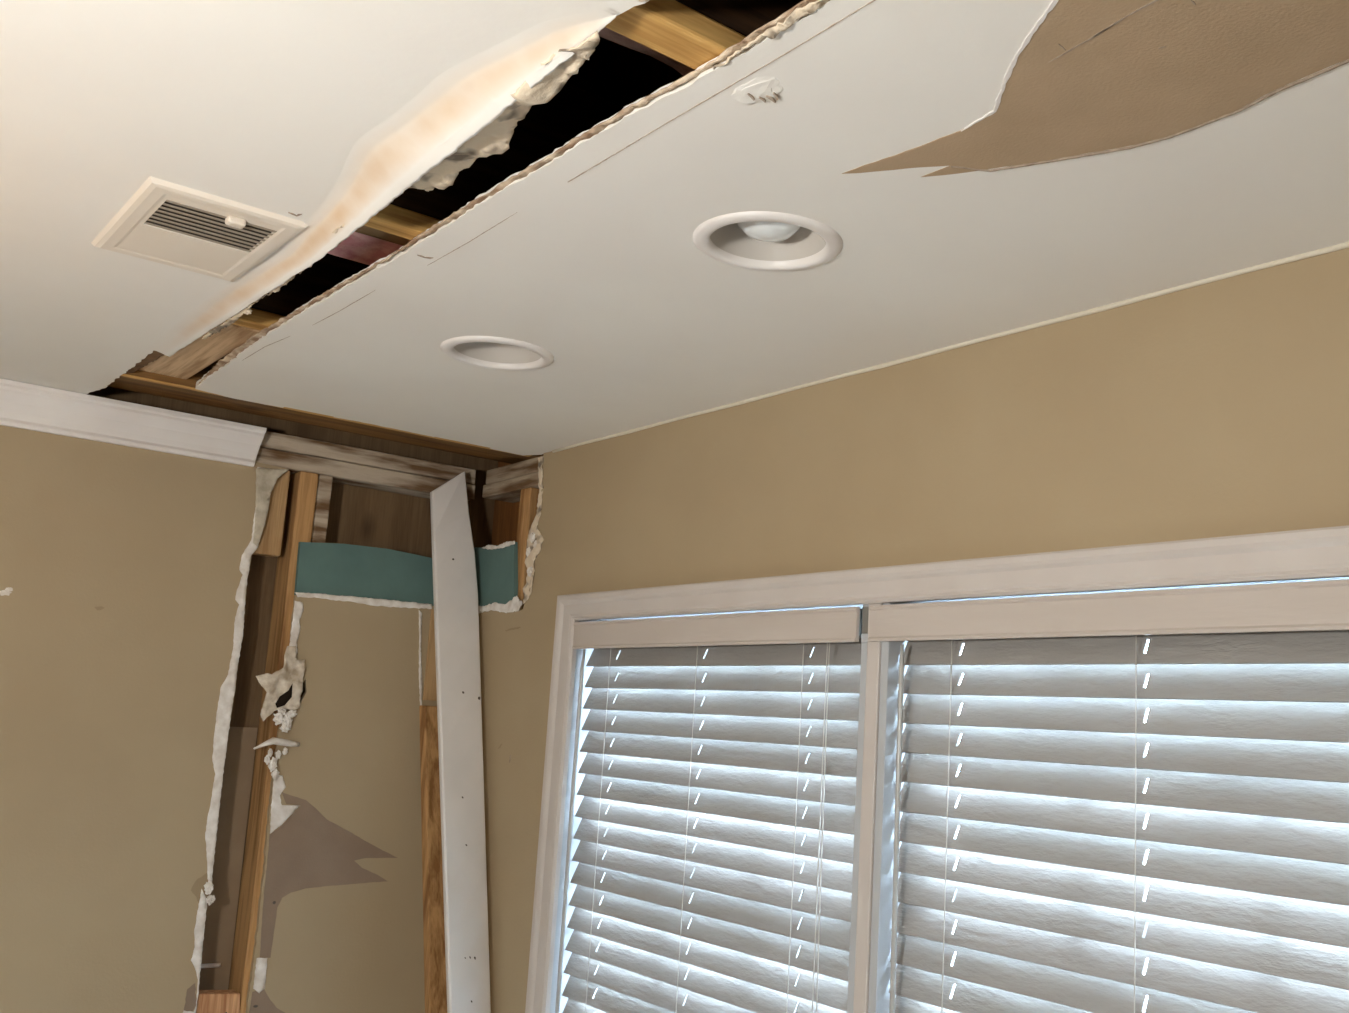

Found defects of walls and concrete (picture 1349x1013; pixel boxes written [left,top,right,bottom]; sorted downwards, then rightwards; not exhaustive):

peeling [713,0,830,69]
peeling [842,0,1349,177]
damp [148,8,618,356]
peeling [526,532,537,577]
peeling [260,792,397,958]
peeling [249,990,285,1013]